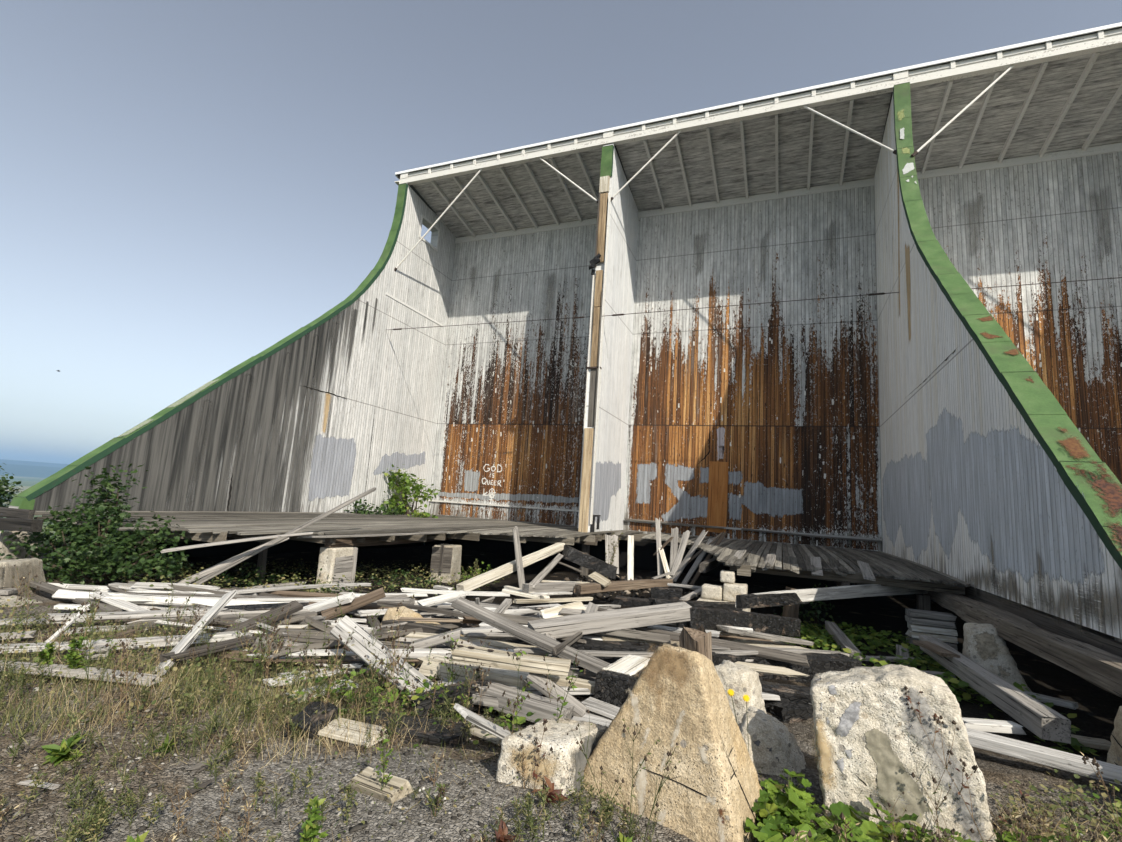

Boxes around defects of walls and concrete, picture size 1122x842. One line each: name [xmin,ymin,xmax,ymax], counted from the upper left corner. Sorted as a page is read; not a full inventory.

corrosion [980,315,1002,339]
water stain [33,298,378,512]
corrosion [1058,427,1122,551]